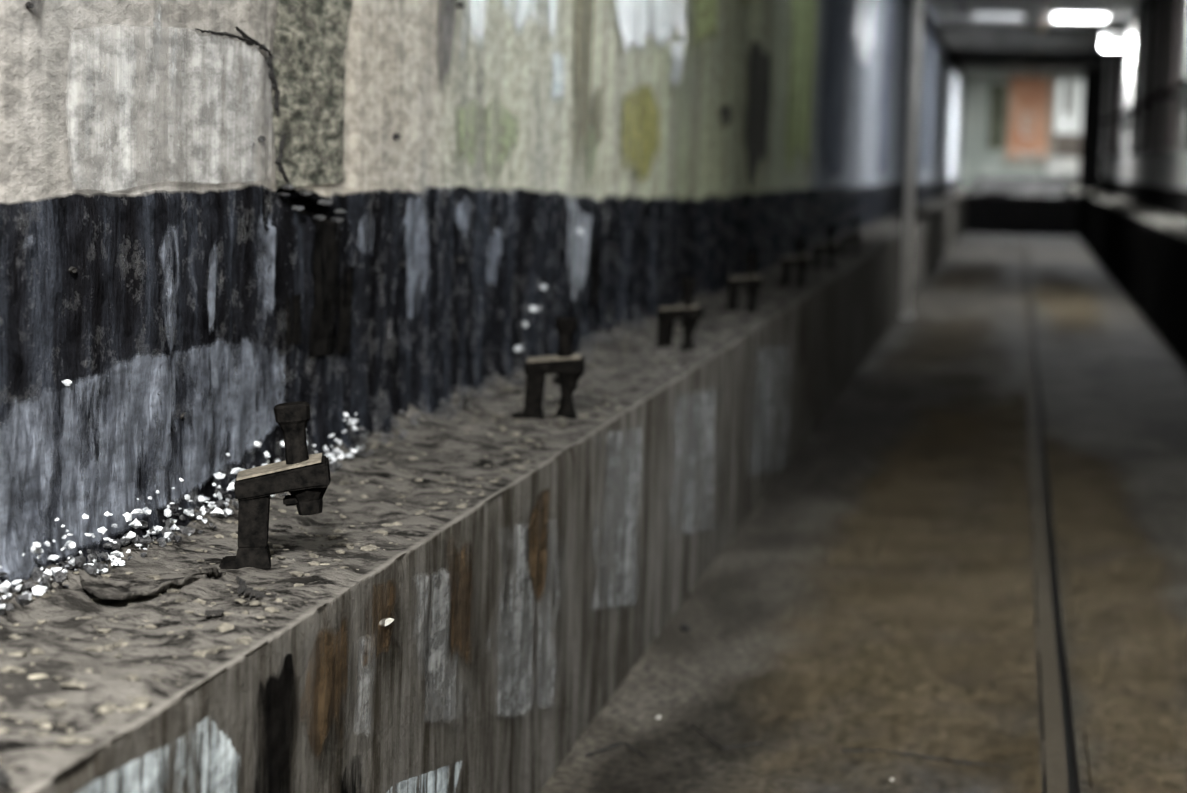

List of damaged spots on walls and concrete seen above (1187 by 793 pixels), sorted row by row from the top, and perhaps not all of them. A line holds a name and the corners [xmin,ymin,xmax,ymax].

water stain [160,227,179,354]
water stain [208,246,217,330]
water stain [256,216,277,320]
water stain [357,213,374,254]
water stain [401,197,429,320]
water stain [453,195,472,242]
water stain [486,228,503,288]
water stain [307,412,361,464]
water stain [0,441,285,609]